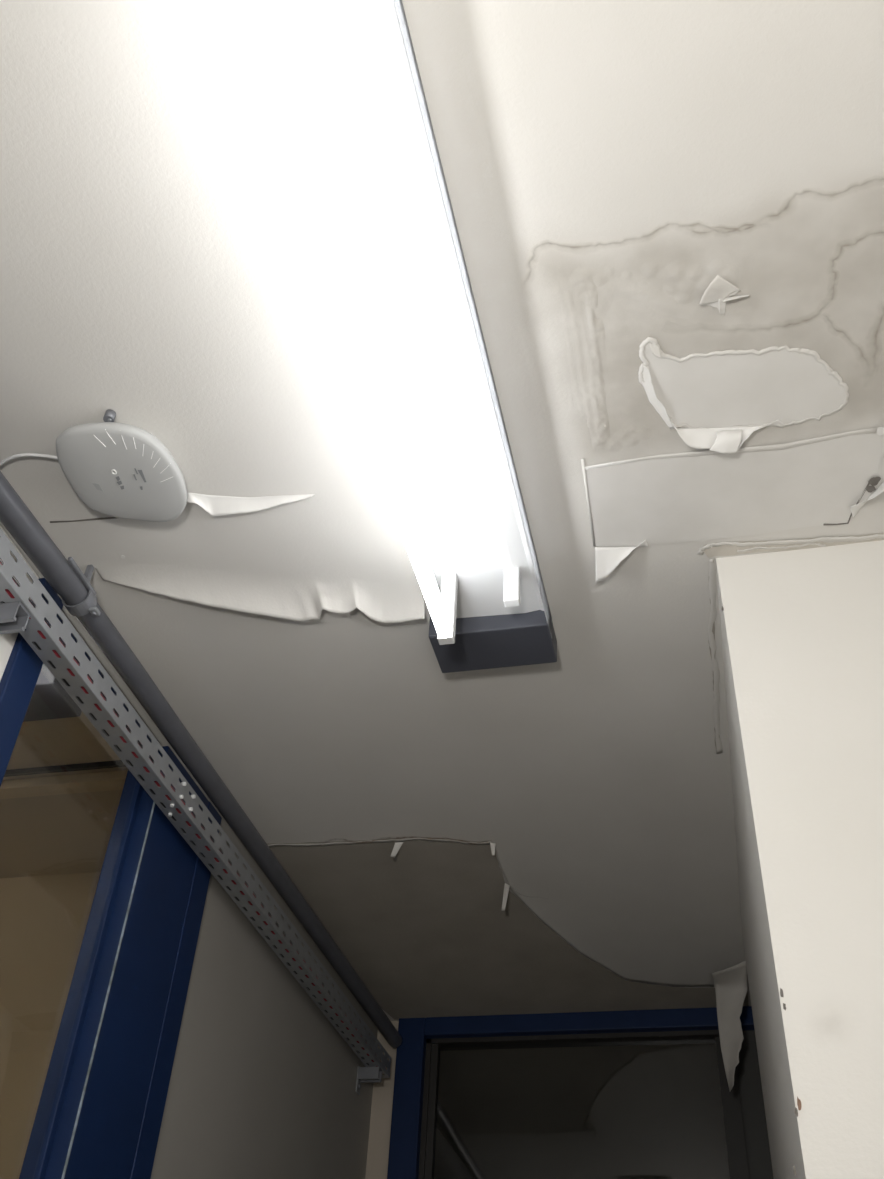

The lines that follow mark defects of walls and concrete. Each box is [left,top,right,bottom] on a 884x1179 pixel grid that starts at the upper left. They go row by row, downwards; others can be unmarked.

peeling [638,337,849,454]
peeling [95,564,425,623]
flaking render [266,837,749,1091]